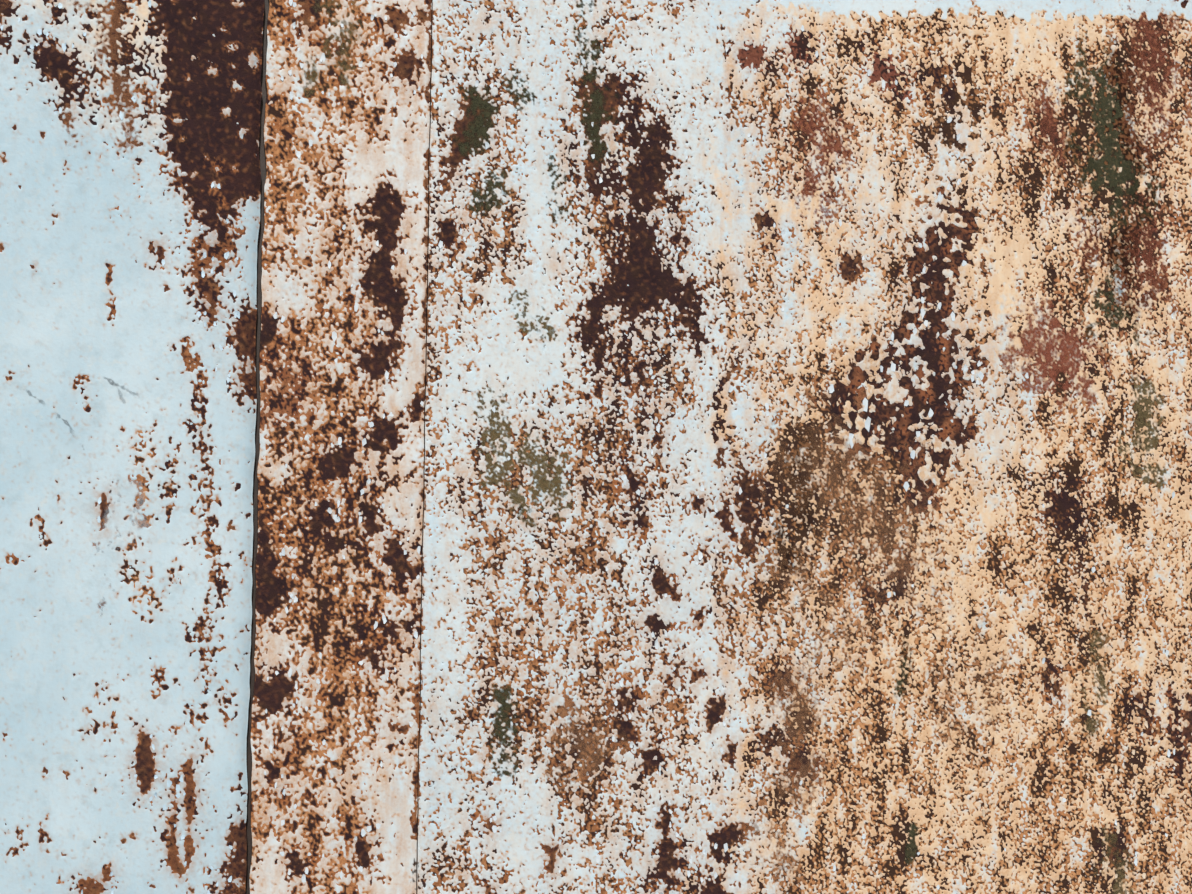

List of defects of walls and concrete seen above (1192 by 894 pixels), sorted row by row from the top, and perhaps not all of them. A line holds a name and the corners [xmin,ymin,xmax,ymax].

peeling [690,77,714,123]
peeling [736,0,793,40]
corrosion [723,25,826,78]
corrosion [860,40,915,107]
corrosion [418,144,521,401]
corrosion [247,337,335,450]
corrosion [999,300,1111,414]
spalling [115,420,163,624]
corrosion [78,336,253,894]
corrosion [409,661,423,840]
corrosion [56,862,119,894]
peeling [203,805,270,894]